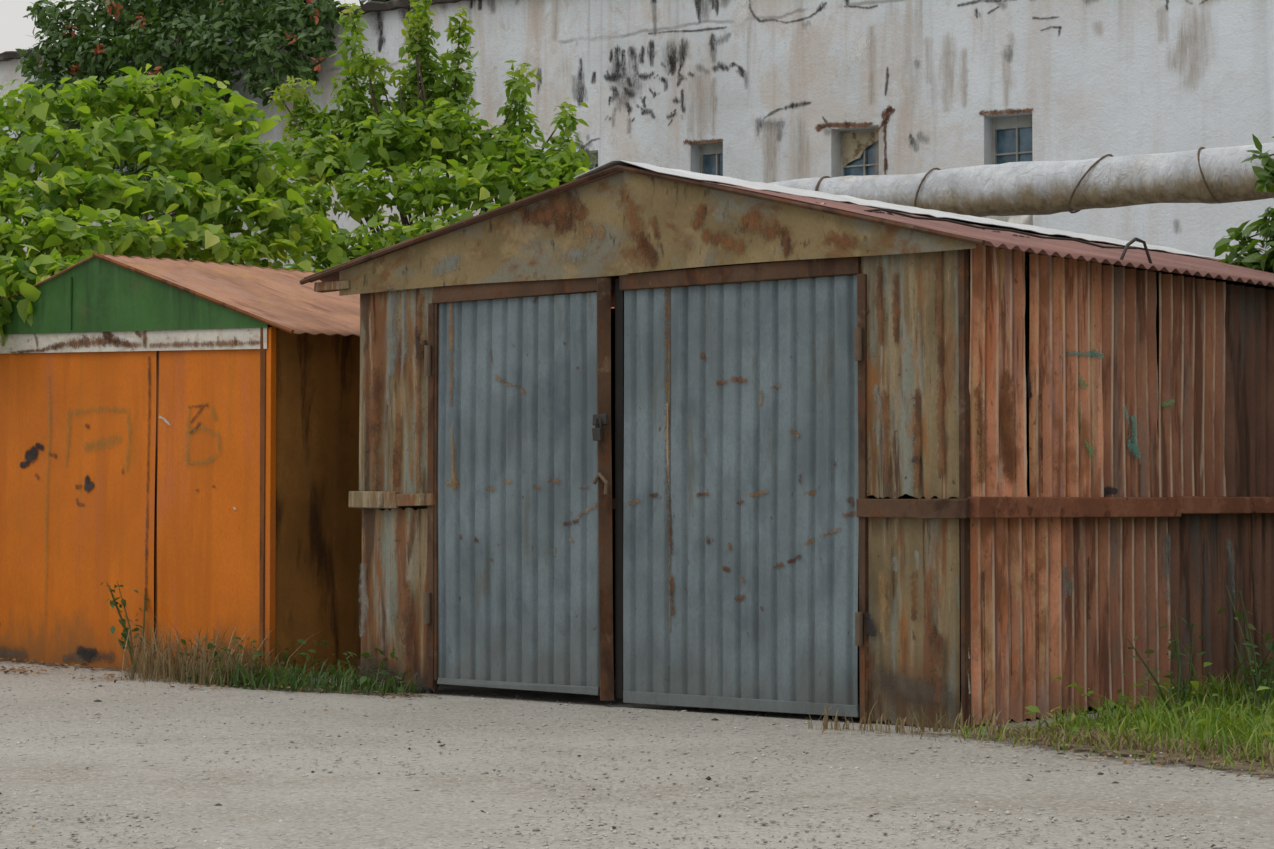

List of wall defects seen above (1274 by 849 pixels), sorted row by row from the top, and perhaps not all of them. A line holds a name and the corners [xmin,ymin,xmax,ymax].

water stain [574,59,586,105]
rust [626,204,659,268]
rust [691,203,793,256]
rust [415,295,428,488]
rust [628,288,674,632]
rust [974,371,1016,482]
rust [775,498,856,568]
rust [360,565,368,636]